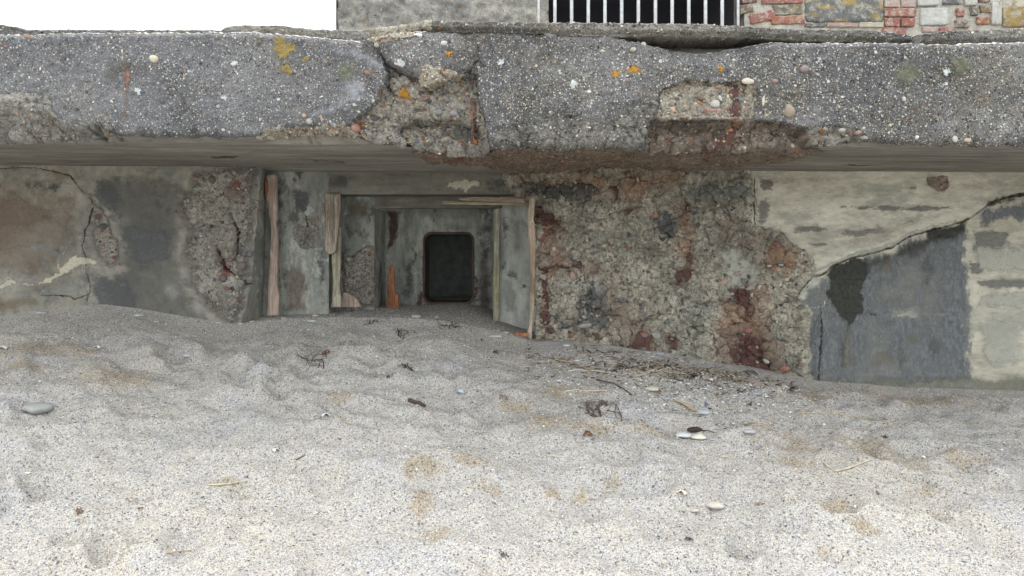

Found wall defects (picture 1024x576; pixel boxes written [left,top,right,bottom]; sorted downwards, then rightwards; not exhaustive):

crack [0,167,93,301]
spalling [0,20,1024,380]
corrosion [716,284,783,374]
leakage [796,202,1024,391]
crack [798,193,1024,381]